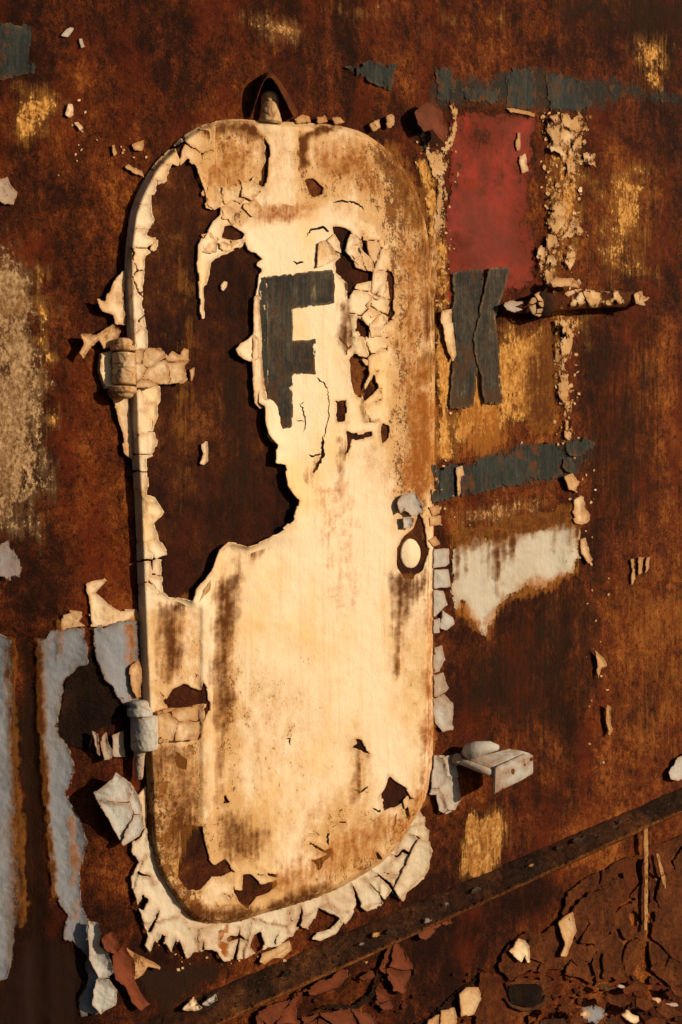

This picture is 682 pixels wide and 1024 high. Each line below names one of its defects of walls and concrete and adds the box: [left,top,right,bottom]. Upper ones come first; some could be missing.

rust [197,121,262,186]
peeling [316,227,394,340]
peeling [139,140,299,602]
crack [297,378,330,473]
peeling [335,354,389,454]
peeling [397,36,682,732]
rust [455,507,580,581]
rust [213,572,241,775]
rust [389,574,432,675]
peeling [36,578,433,1024]
rust [181,714,434,957]
peeling [429,755,461,814]